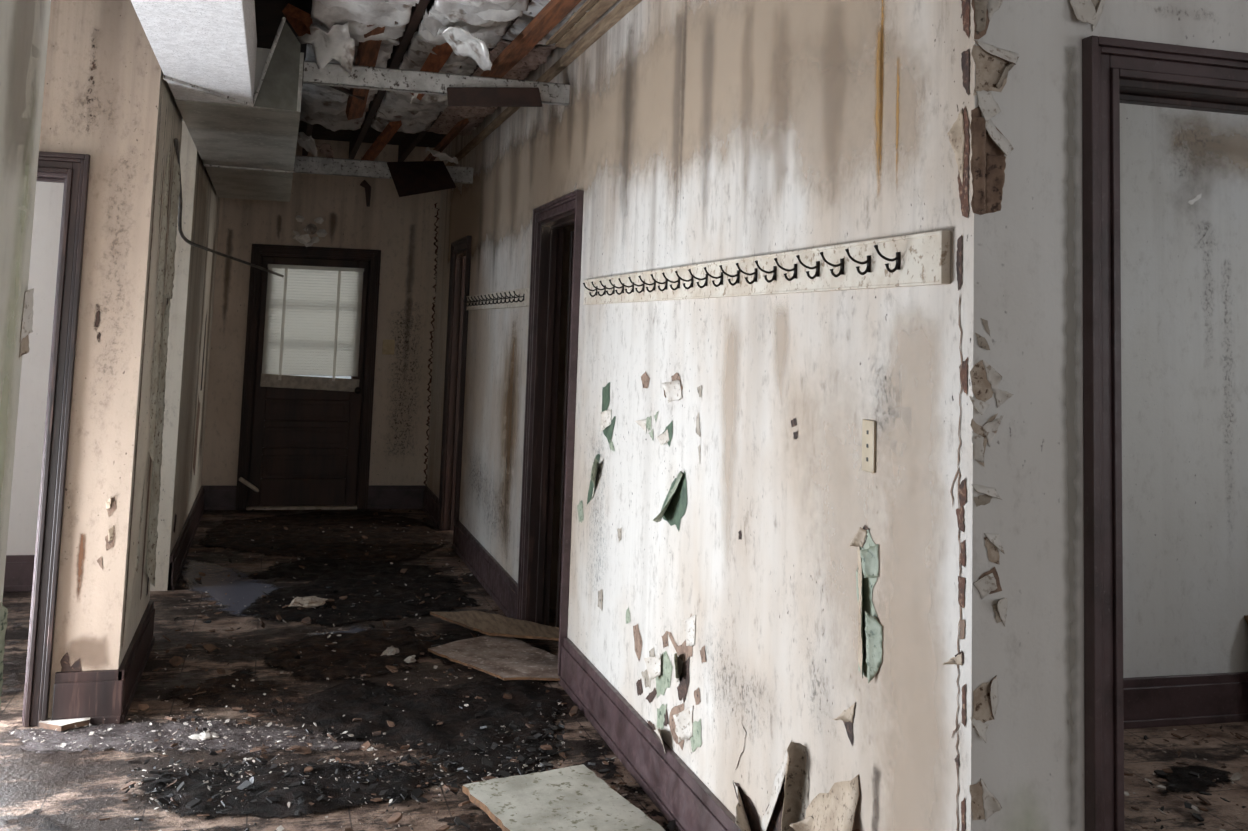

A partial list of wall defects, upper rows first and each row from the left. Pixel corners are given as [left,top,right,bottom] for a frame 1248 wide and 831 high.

leakage [448,0,917,261]
peeling [947,0,1019,218]
leakage [471,333,515,532]
peeling [577,382,616,523]
peeling [653,471,687,531]
peeling [849,525,883,684]
peeling [942,478,1008,665]
peeling [959,318,1014,466]
peeling [626,607,706,754]
peeling [961,675,999,743]
peeling [733,740,860,831]
peeling [961,779,1002,831]